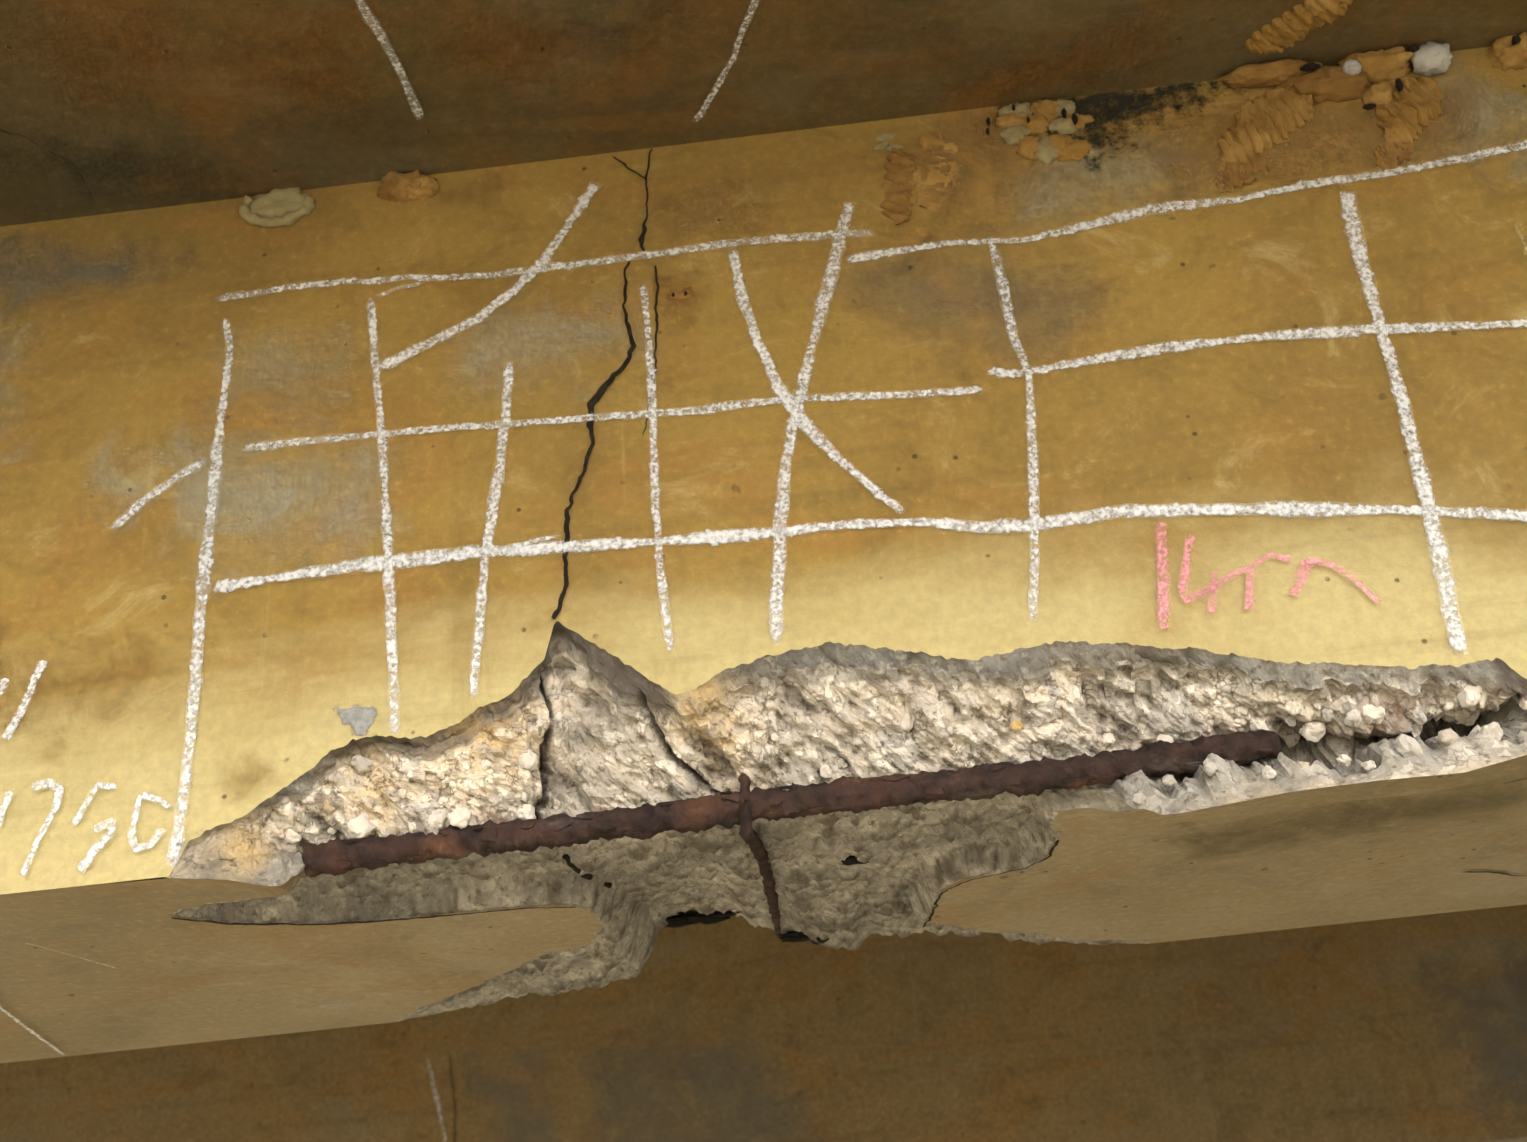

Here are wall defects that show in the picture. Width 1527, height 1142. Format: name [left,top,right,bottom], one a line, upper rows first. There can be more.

crack [551,148,660,619]
spalling [168,621,1527,1022]